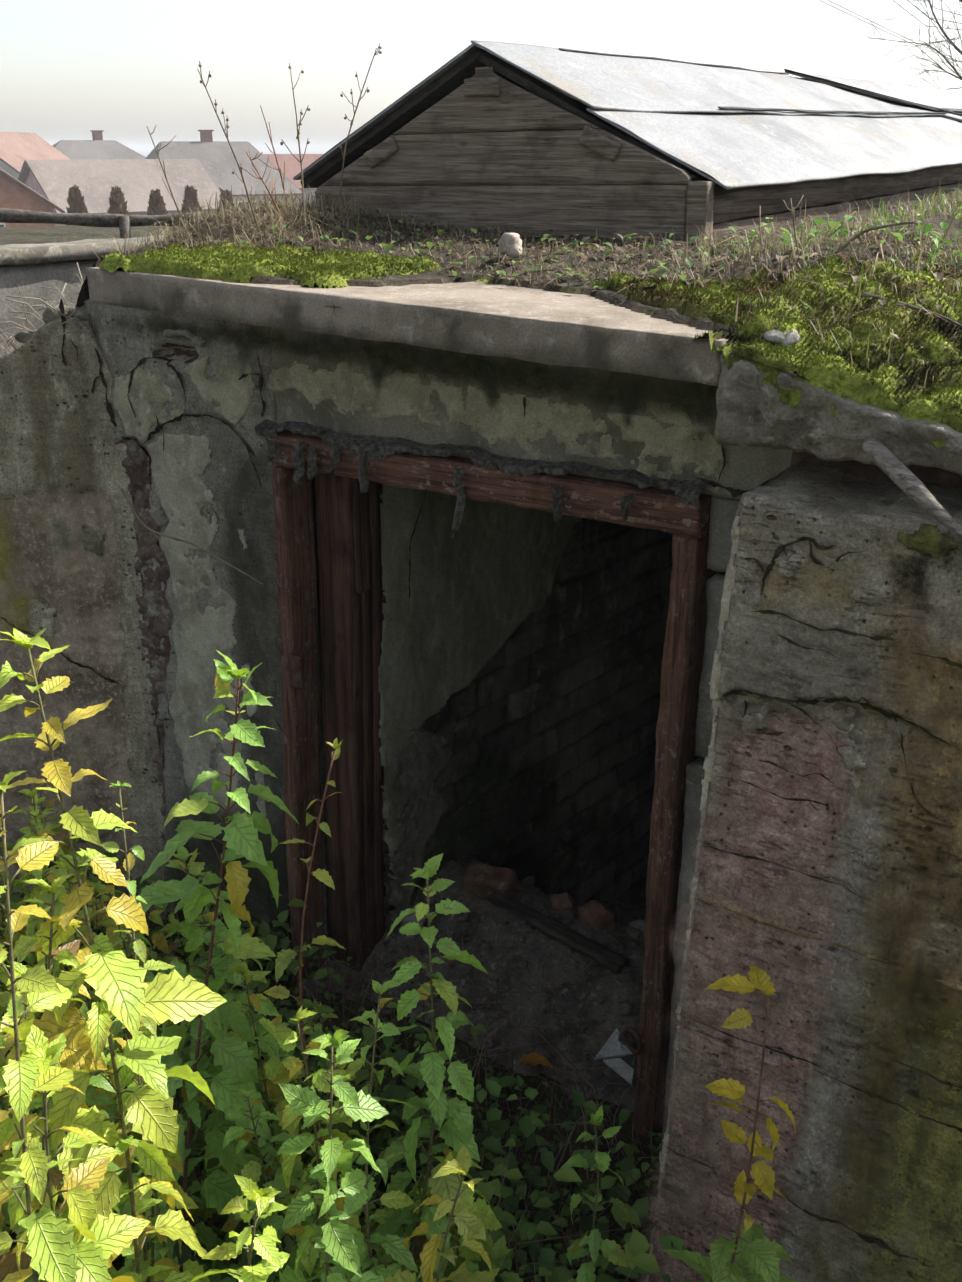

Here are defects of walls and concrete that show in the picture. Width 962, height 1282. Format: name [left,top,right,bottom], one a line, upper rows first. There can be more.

crack [59,299,266,488]
spalling [0,329,727,934]
crack [744,536,962,668]
crack [717,690,953,817]
water stain [914,653,962,918]